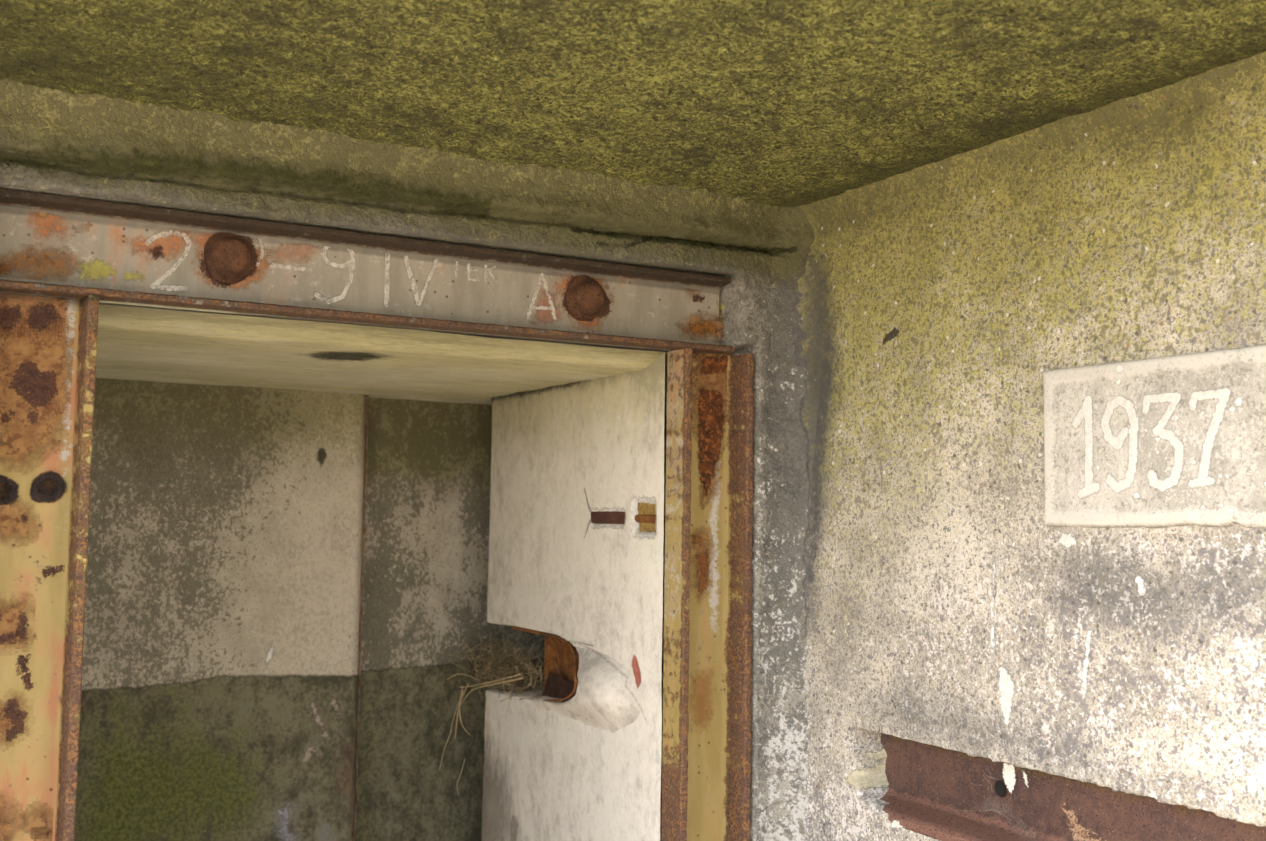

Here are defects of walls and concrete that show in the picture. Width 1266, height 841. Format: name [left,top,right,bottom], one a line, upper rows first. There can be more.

rust [0,212,73,280]
rust [132,230,267,288]
rust [532,274,612,328]
rust [0,302,73,467]
rust [682,289,733,510]
rust [0,501,39,541]
rust [42,565,65,578]
rust [691,528,713,598]
rust [0,600,35,741]
rust [0,796,53,841]
water stain [273,804,296,841]
water stain [481,741,514,841]